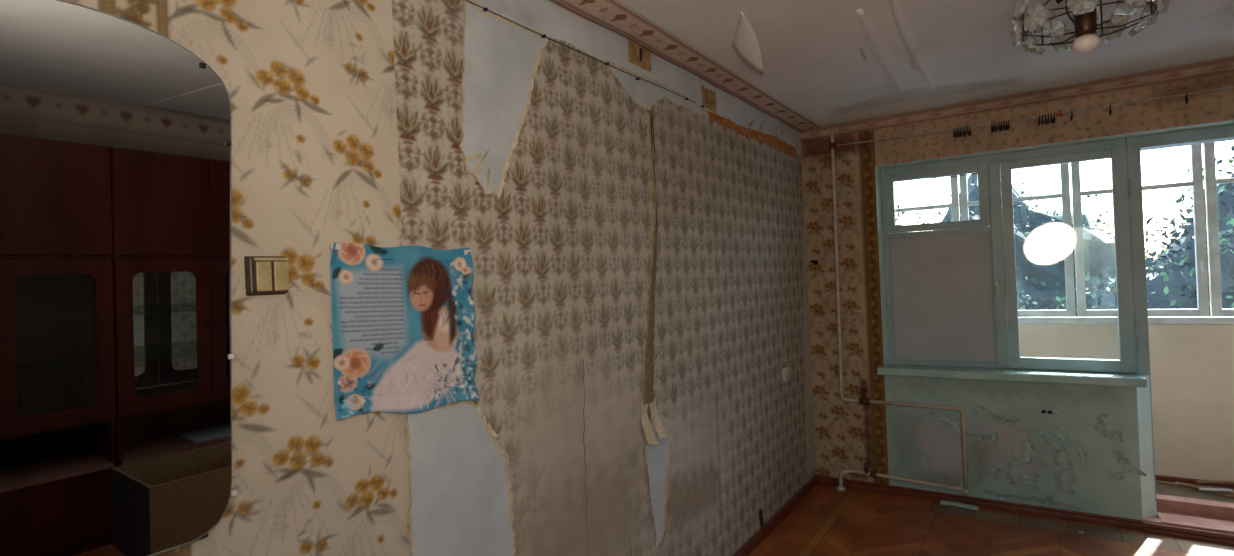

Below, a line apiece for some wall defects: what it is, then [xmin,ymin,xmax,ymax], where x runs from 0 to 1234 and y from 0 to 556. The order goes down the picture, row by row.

peeling [459,0,797,199]
peeling [406,383,516,556]
peeling [645,414,673,548]